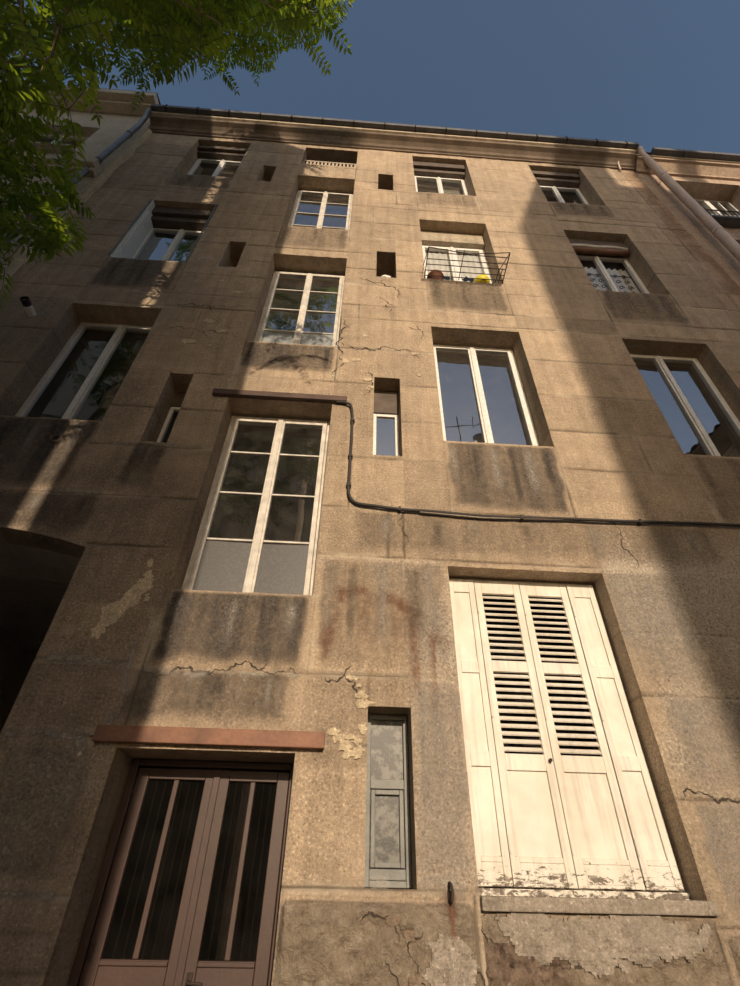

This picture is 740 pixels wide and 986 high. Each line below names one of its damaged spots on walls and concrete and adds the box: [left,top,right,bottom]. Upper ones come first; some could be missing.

crack [331,278,424,394]
leakage [0,417,99,509]
leakage [451,444,565,509]
flaking render [91,558,155,639]
leakage [154,592,306,661]
crack [141,661,299,682]
crack [325,666,358,693]
spalling [345,673,376,708]
spalling [327,723,367,759]
crack [683,788,740,804]
crack [360,911,426,986]
flaking render [385,912,713,986]